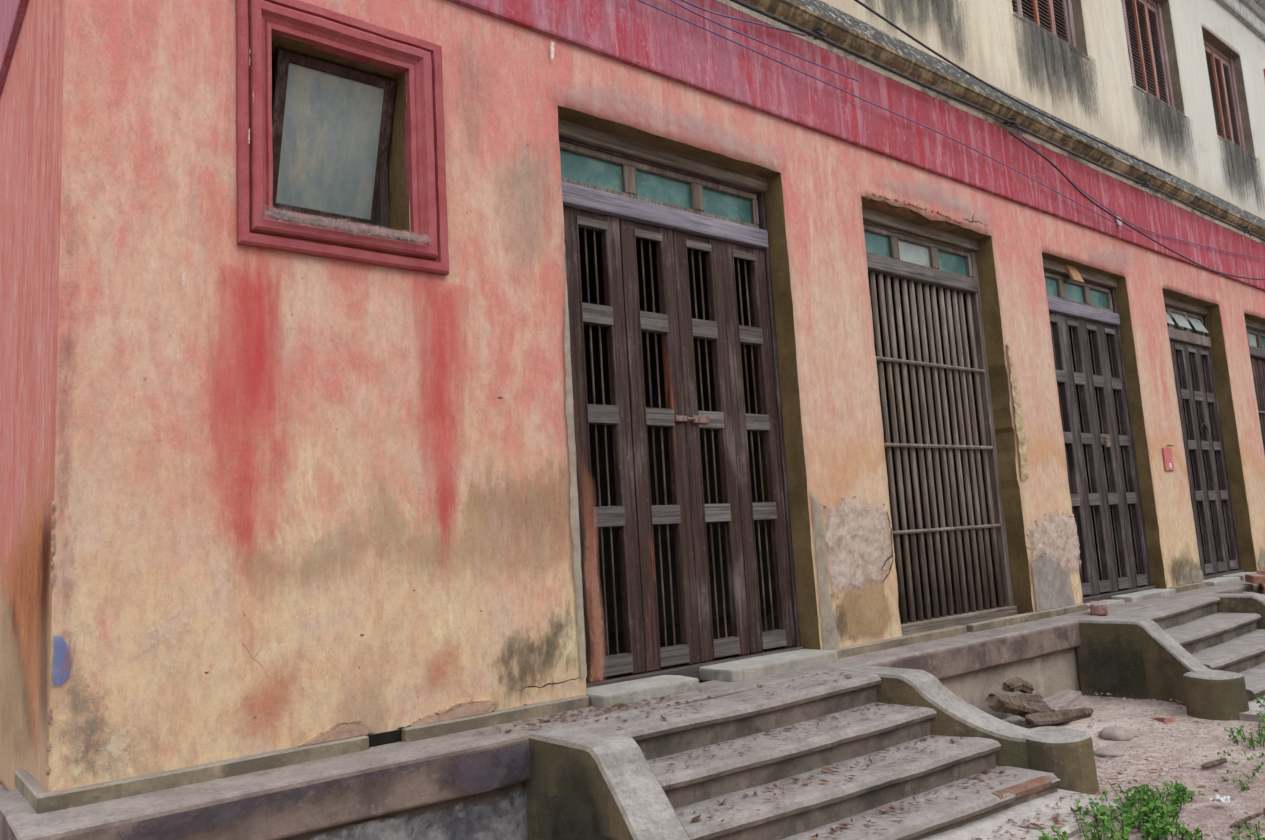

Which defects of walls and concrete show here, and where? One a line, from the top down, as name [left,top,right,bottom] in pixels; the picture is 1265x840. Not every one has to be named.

water stain [869,0,966,60]
water stain [1015,13,1102,118]
water stain [1134,85,1197,166]
water stain [1221,135,1265,211]
spalling [824,496,895,598]
spalling [1027,509,1081,571]
water stain [498,612,576,692]
crack [519,677,579,691]